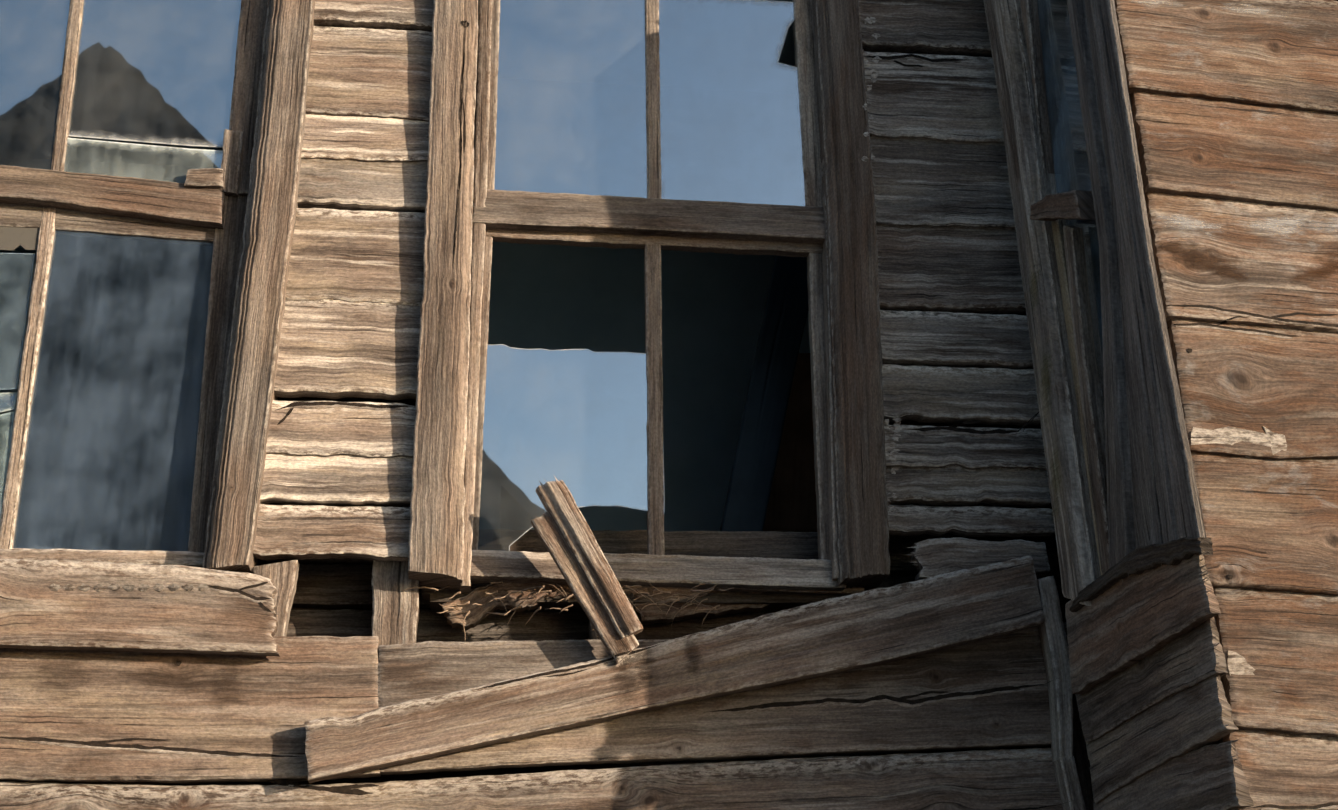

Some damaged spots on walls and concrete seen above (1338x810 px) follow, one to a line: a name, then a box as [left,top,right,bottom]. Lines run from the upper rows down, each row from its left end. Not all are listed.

crack [703,678,1057,714]
crack [0,737,379,799]